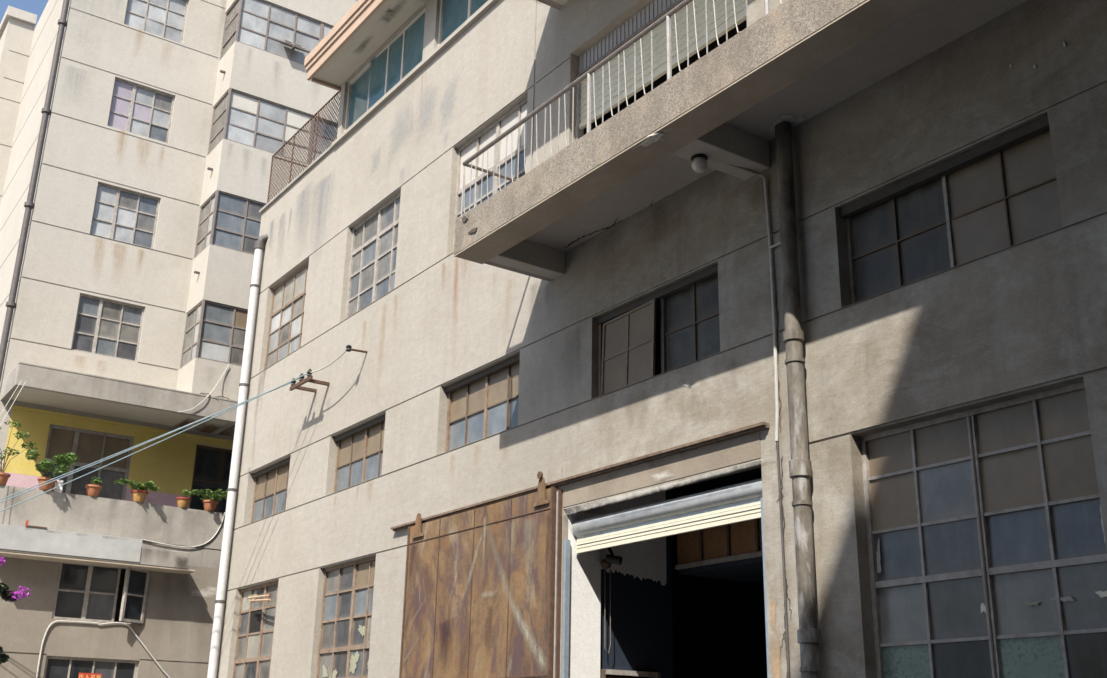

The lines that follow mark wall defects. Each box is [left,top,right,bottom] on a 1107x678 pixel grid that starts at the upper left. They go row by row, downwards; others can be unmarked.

crack [564,201,653,248]